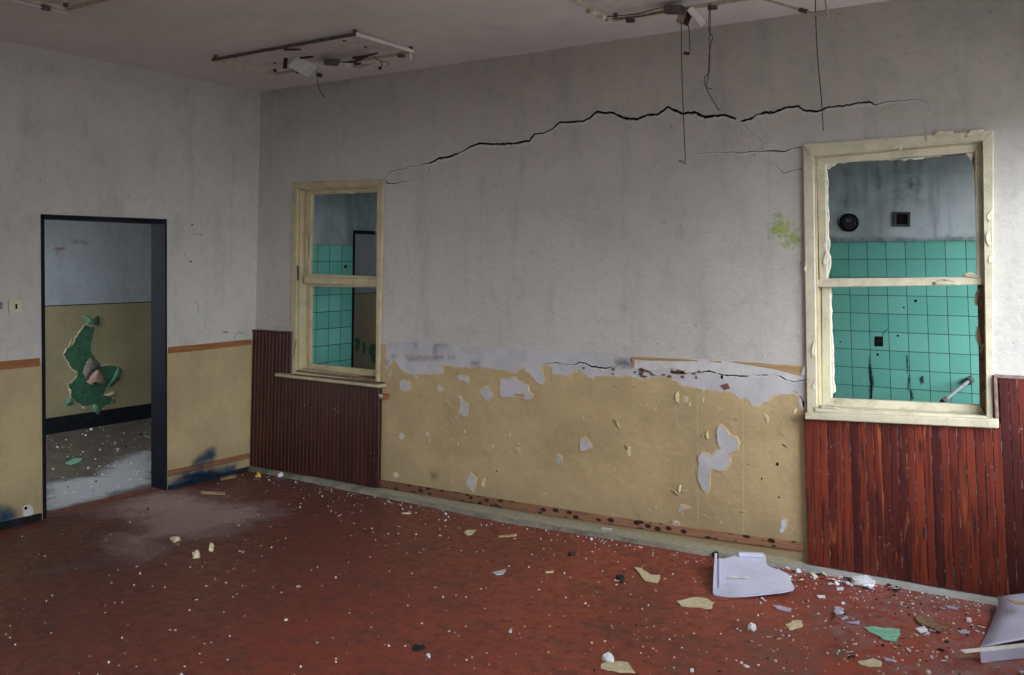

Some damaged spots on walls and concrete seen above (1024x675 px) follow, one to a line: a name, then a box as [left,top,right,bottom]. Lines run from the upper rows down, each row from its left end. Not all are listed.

crack [385,100,930,186]
peeling [62,315,122,415]
crack [543,362,614,371]
flaking render [354,337,807,425]
peeling [465,471,486,493]
peeling [579,436,593,453]
peeling [670,418,740,526]